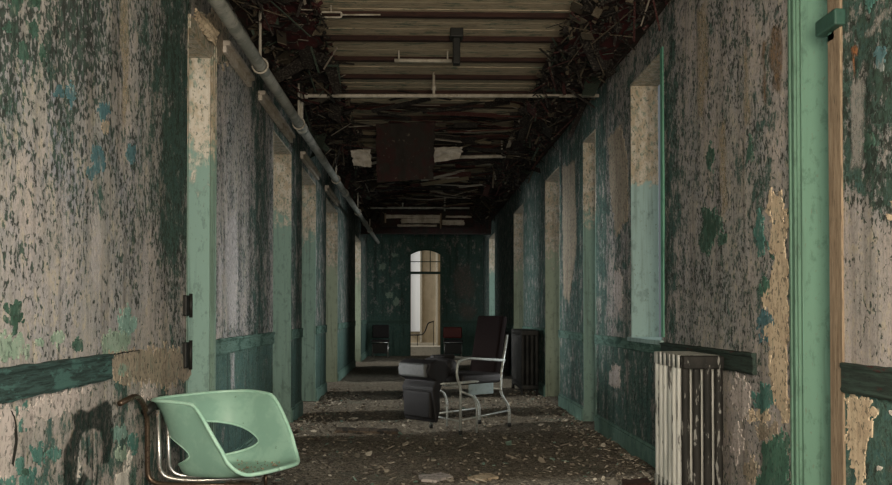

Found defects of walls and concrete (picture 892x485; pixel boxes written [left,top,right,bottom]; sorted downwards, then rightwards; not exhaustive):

peeling [2,0,47,65]
peeling [873,46,887,72]
flaking render [386,215,472,227]
spalling [562,160,577,304]
peeling [698,207,727,257]
spalling [101,302,191,402]
spalling [609,363,621,388]
spalling [729,187,791,485]
spalling [0,384,92,485]
damp [64,401,114,485]
peeling [111,423,139,485]
spalling [844,394,892,485]